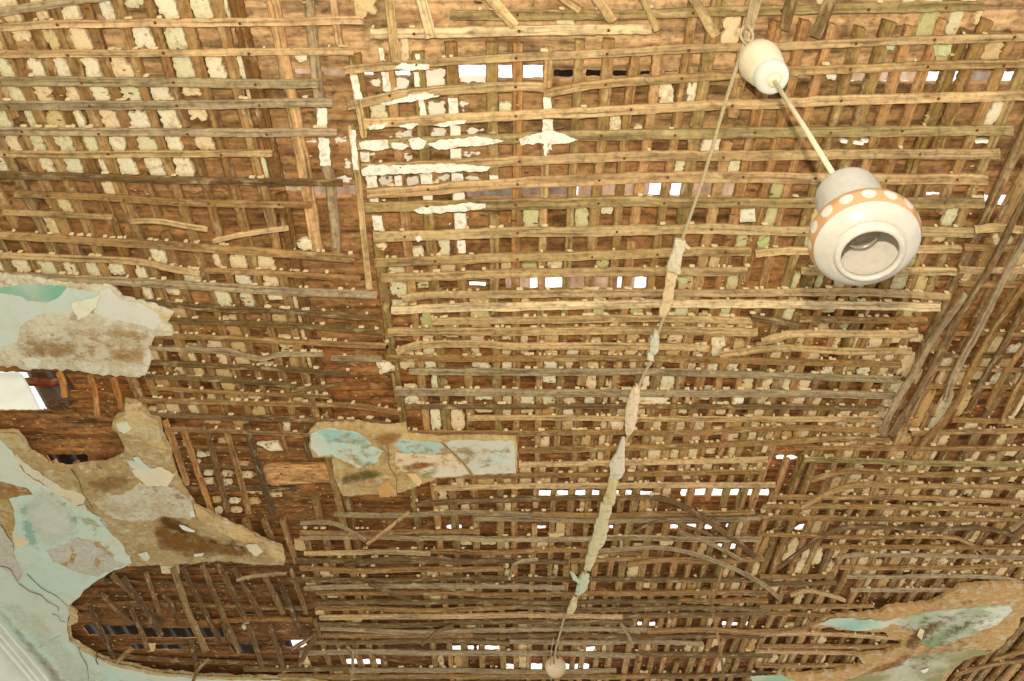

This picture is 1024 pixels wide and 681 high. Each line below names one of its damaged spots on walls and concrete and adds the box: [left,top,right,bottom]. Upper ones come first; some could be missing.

leakage [21,331,143,362]
leakage [155,518,247,556]